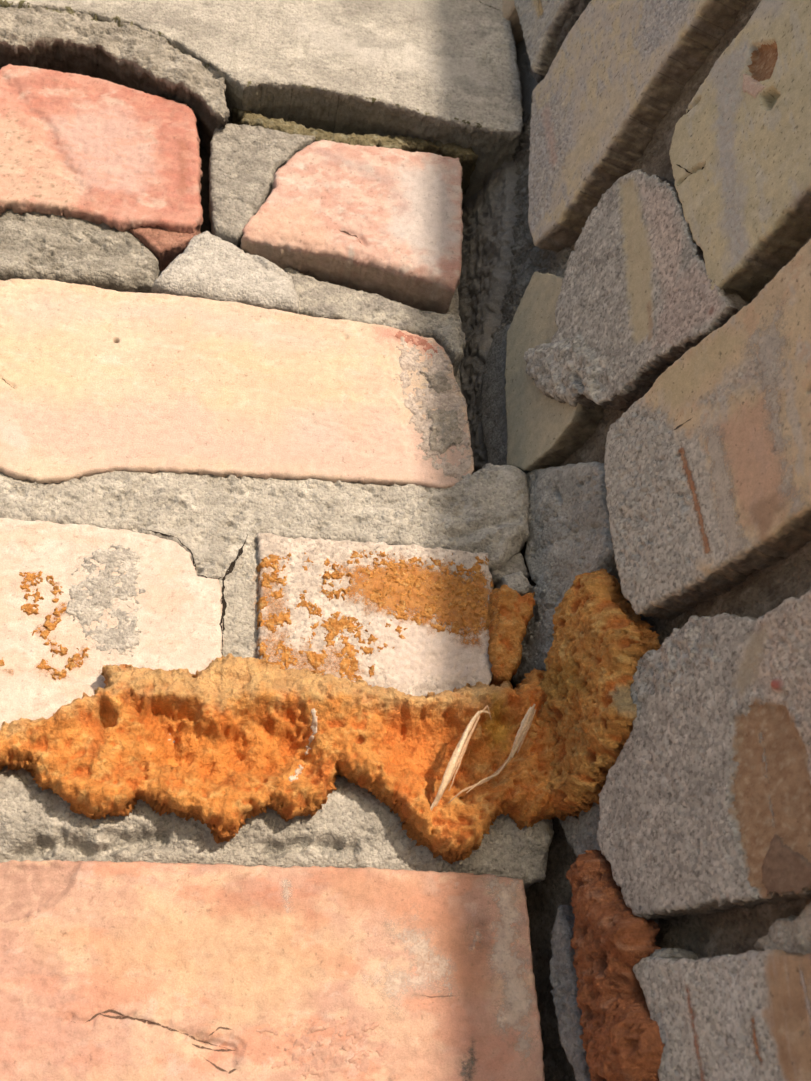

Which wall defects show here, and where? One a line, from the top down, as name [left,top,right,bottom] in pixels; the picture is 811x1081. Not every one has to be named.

peeling [742,41,778,98]
spalling [393,334,474,482]
spalling [66,543,148,662]
crack [149,530,248,654]
crack [71,1009,236,1074]